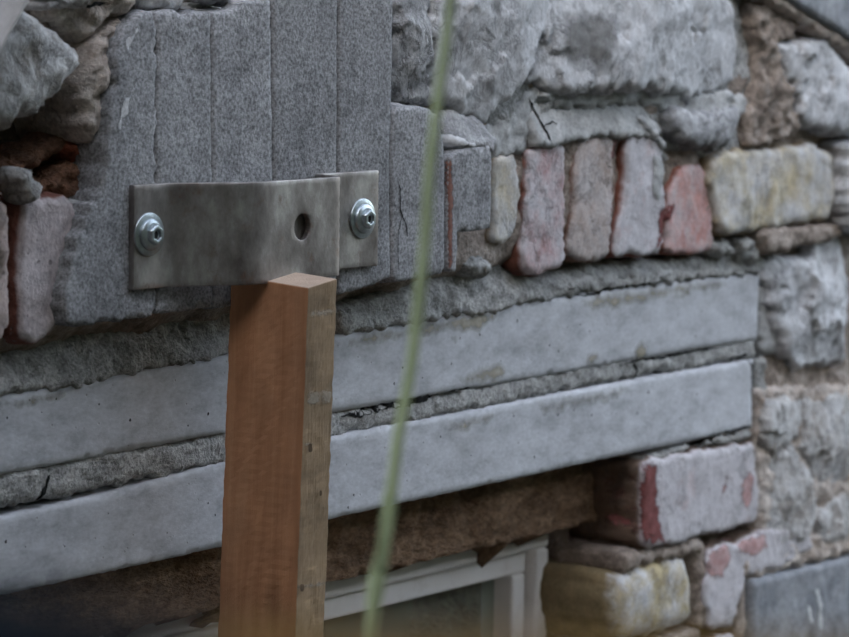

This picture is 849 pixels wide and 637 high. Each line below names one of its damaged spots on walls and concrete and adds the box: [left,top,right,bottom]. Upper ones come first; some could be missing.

crack [529,99,557,142]